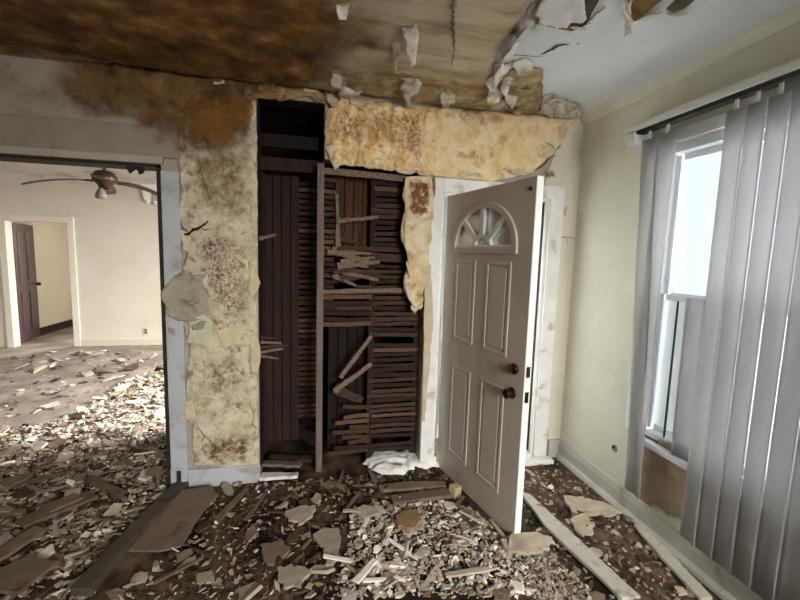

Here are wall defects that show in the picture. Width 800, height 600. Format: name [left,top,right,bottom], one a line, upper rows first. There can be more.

crack [448,0,456,65]
peeling [618,0,694,37]
water stain [0,0,346,203]
crack [180,156,213,236]
peeling [302,0,606,422]
peeling [165,99,261,467]
water stain [204,240,243,308]